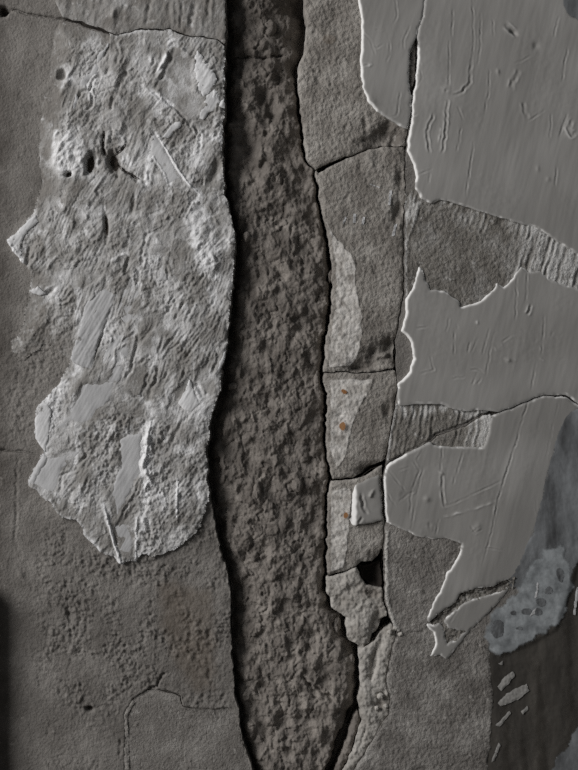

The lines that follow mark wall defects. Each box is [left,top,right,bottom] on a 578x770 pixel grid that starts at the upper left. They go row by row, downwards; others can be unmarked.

peeling [194,50,225,120]
crack [409,19,422,96]
spalling [102,131,139,179]
peeling [7,215,38,258]
peeling [405,188,578,307]
peeling [28,284,139,492]
peeling [178,380,200,412]
peeling [387,404,491,462]
crack [318,119,578,622]
peeling [112,433,142,514]
crack [153,673,192,708]
leakage [487,563,578,770]